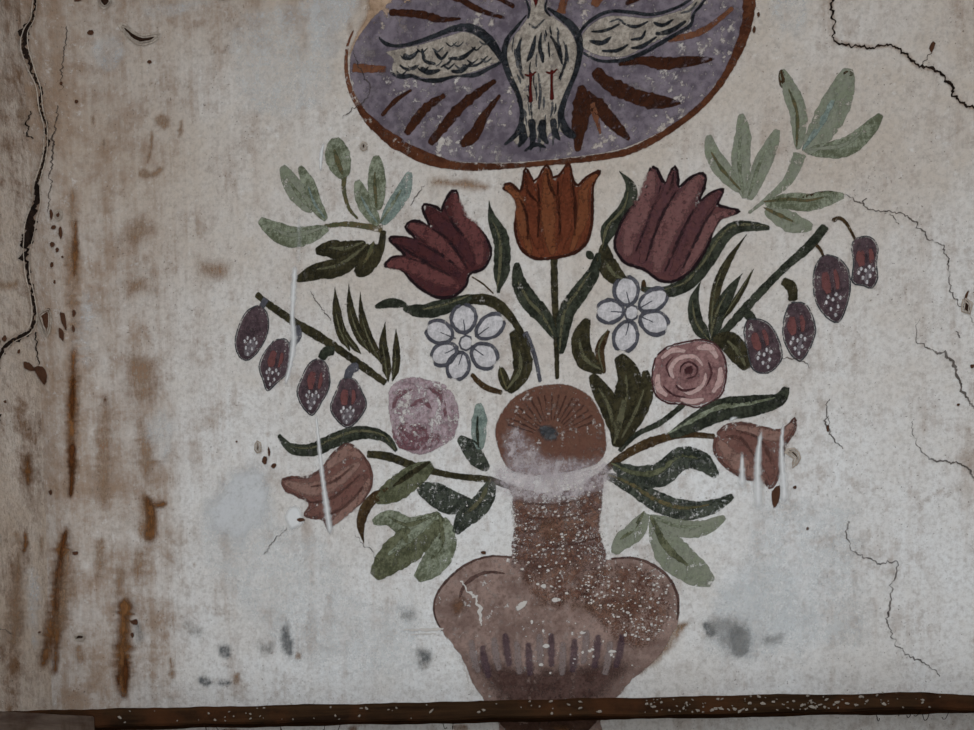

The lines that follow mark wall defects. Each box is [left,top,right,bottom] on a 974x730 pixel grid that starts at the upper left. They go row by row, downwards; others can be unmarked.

crack [0,0,68,364]
crack [846,194,974,408]
corrosion [23,456,33,485]
corrosion [138,424,156,473]
corrosion [138,494,167,540]
spalling [771,485,780,507]
spalling [784,447,801,468]
crack [823,399,843,449]
crack [911,423,974,478]
corrosion [40,528,74,672]
corrosion [113,552,144,697]
crack [845,521,940,677]